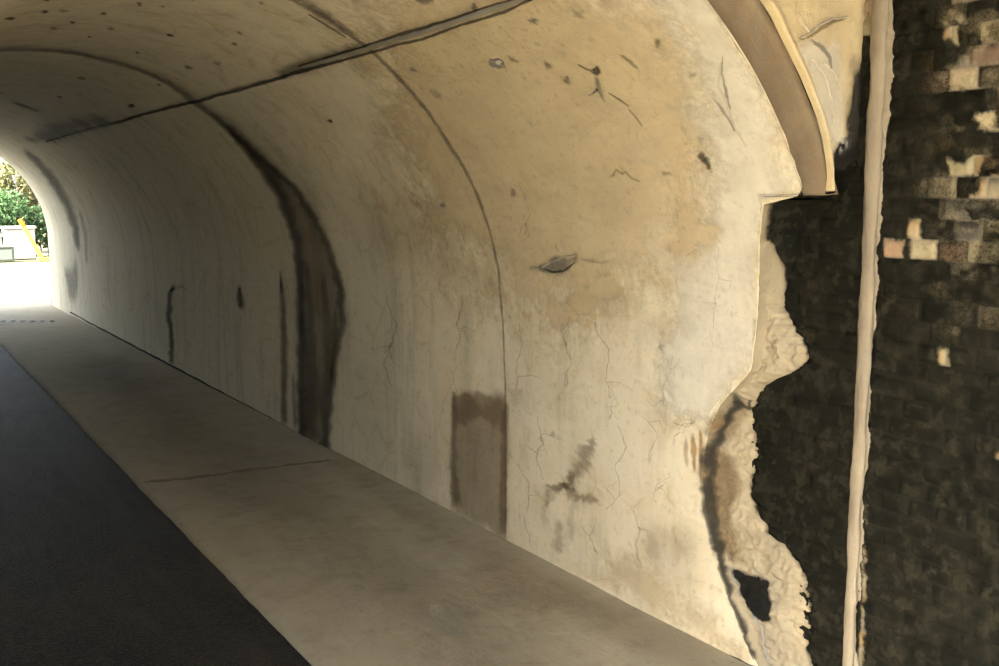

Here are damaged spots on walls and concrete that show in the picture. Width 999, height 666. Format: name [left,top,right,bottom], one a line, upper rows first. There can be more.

crack [0,0,532,435]
crack [502,388,510,522]
peeling [349,0,813,666]
crack [699,395,755,658]
damp [751,0,999,666]